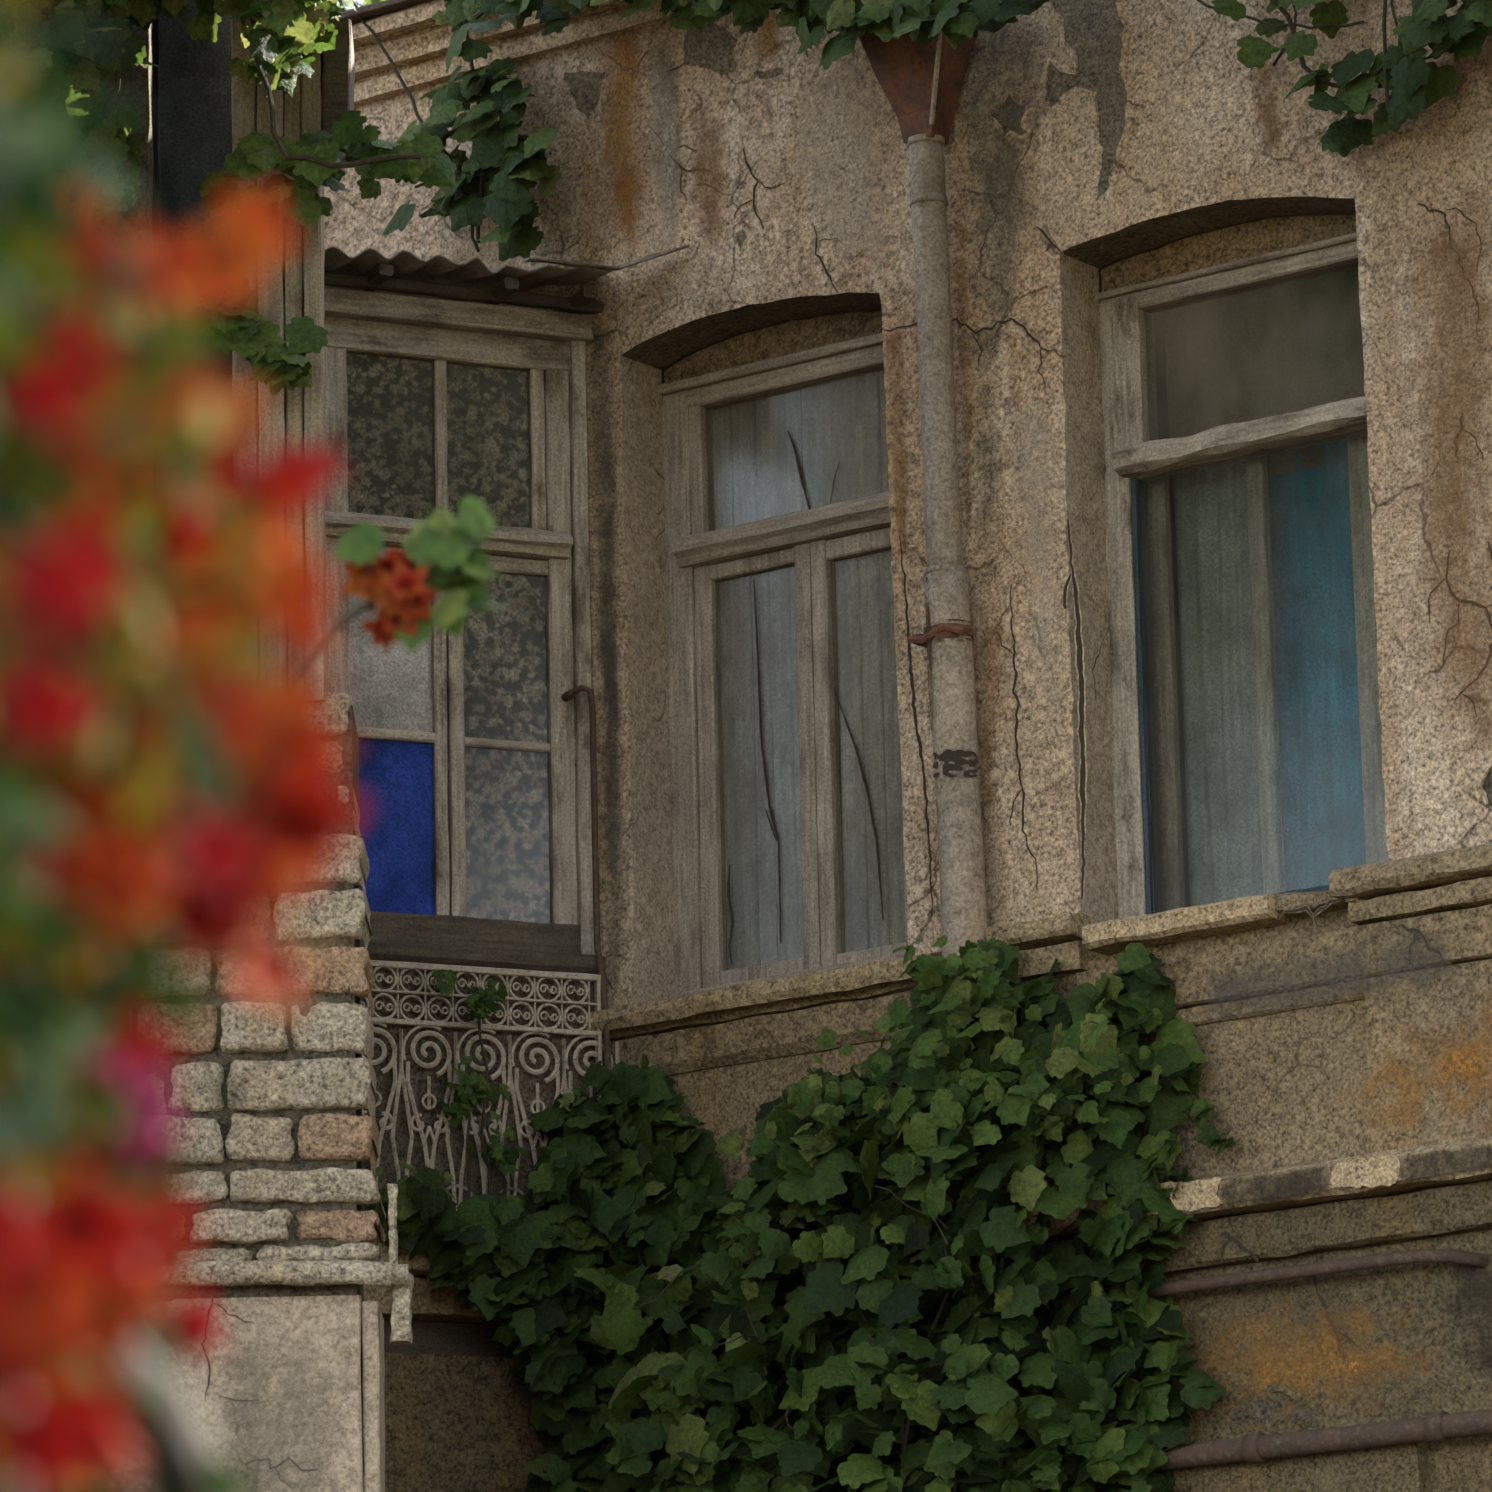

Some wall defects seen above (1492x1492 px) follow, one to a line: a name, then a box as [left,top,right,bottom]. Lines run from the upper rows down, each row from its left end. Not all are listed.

peeling [557,63,614,132]
crack [649,126,709,200]
crack [734,148,785,227]
peeling [982,0,1135,198]
crack [1417,203,1482,335]
crack [952,317,1066,385]
crack [899,535,934,917]
rust [923,576,974,731]
crack [996,584,1038,889]
crack [1062,519,1110,899]
crack [1427,541,1492,717]
spalling [1472,757,1492,830]